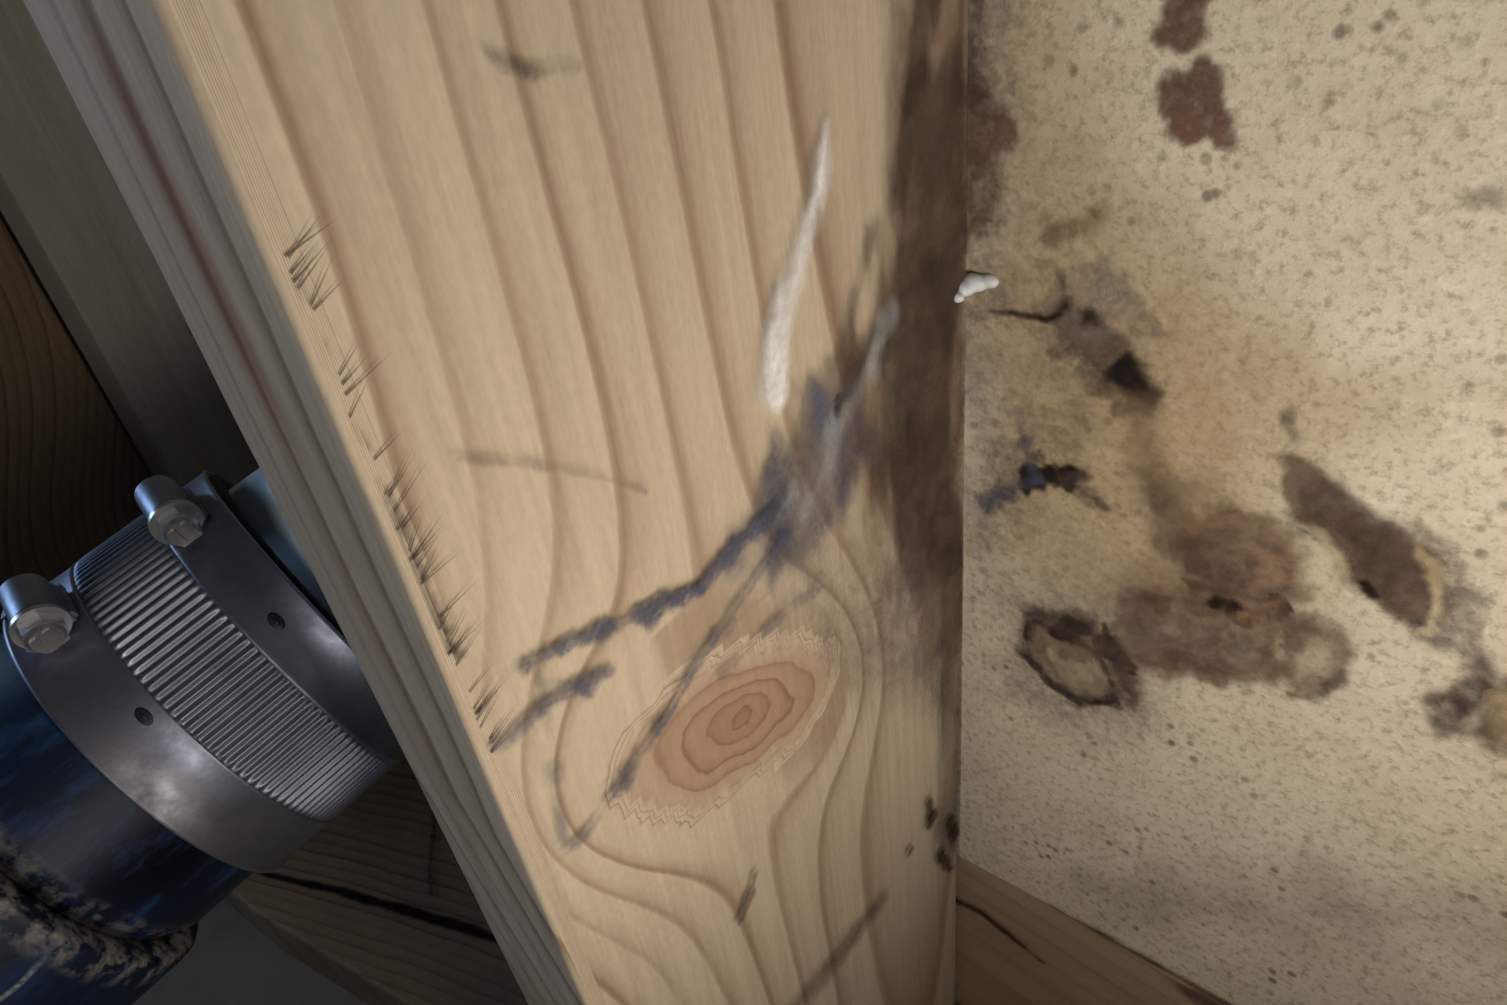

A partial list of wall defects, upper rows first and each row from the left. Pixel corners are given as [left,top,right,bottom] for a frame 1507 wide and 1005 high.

damp [1153,0,1235,149]
damp [509,0,1016,783]
damp [979,437,1108,511]
damp [1021,263,1214,445]
damp [1114,482,1350,699]
damp [1426,660,1507,746]